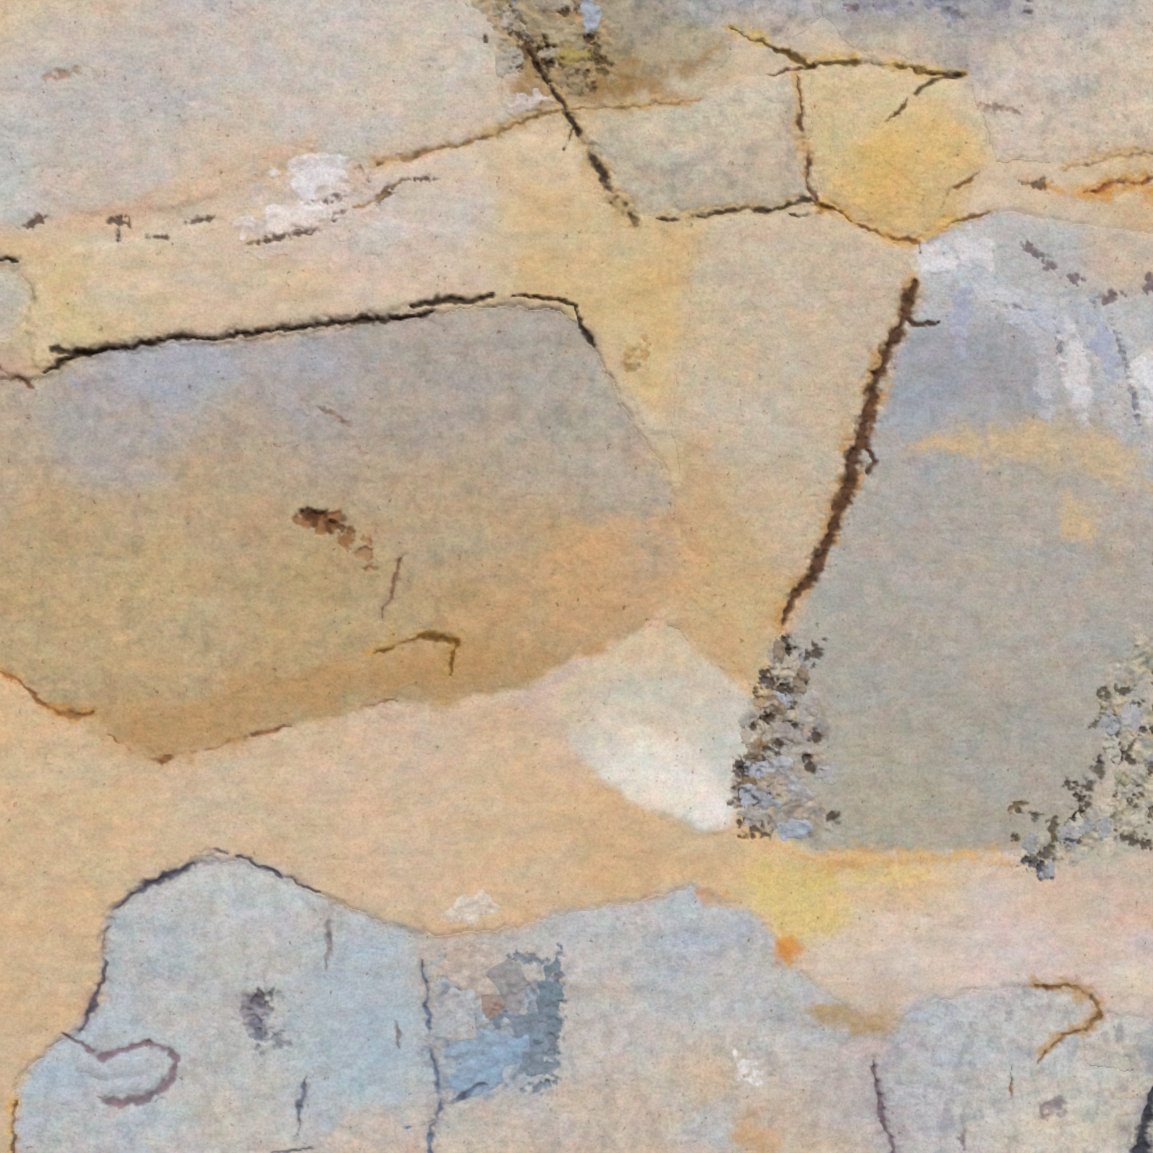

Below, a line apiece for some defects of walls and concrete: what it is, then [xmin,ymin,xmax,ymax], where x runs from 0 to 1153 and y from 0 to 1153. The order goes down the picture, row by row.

spalling [456,0,629,111]
crack [0,291,596,391]
crack [352,15,999,636]
spalling [723,629,846,844]
spalling [1006,608,1153,882]
crack [1122,1075,1153,1153]